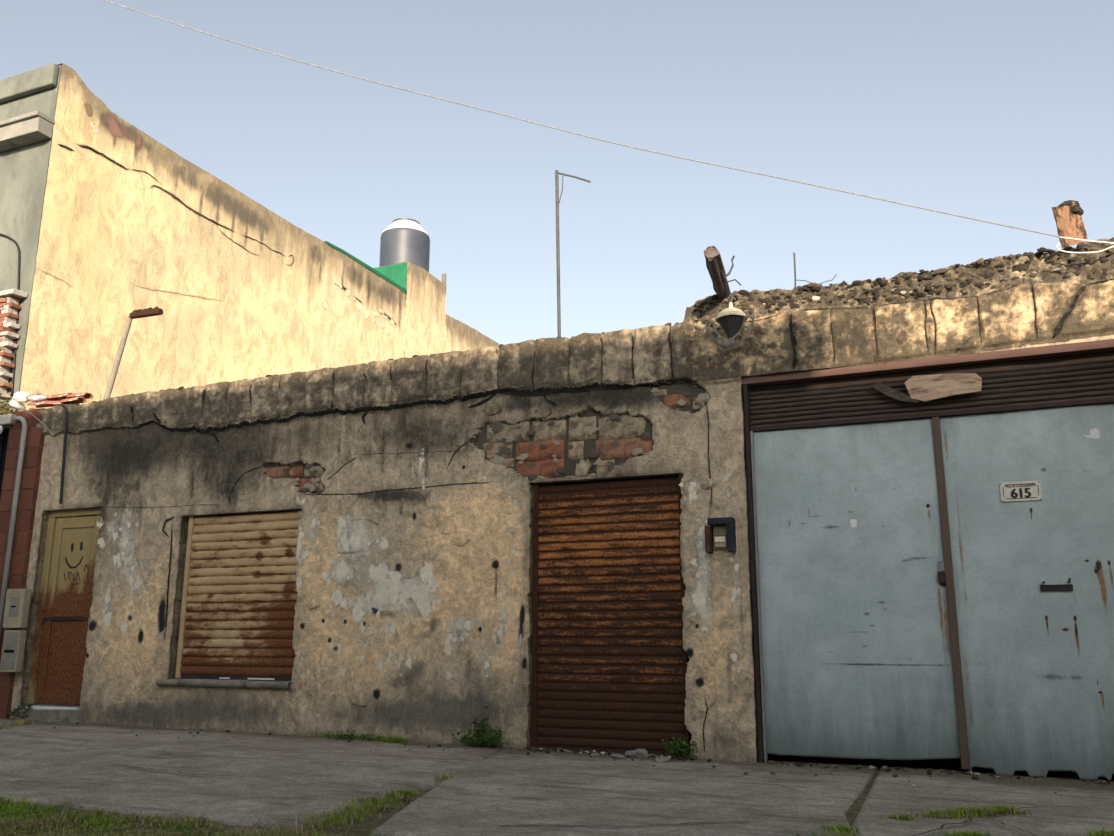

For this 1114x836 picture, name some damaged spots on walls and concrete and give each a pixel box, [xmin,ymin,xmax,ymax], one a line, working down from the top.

crack [58,144,294,266]
water stain [176,169,267,238]
crack [703,279,1113,371]
crack [129,327,680,443]
flaking render [649,379,711,413]
flaking render [264,461,326,562]
crack [300,442,500,514]
flaking render [471,408,654,481]
peeling [321,514,441,677]
rust [1085,560,1113,605]